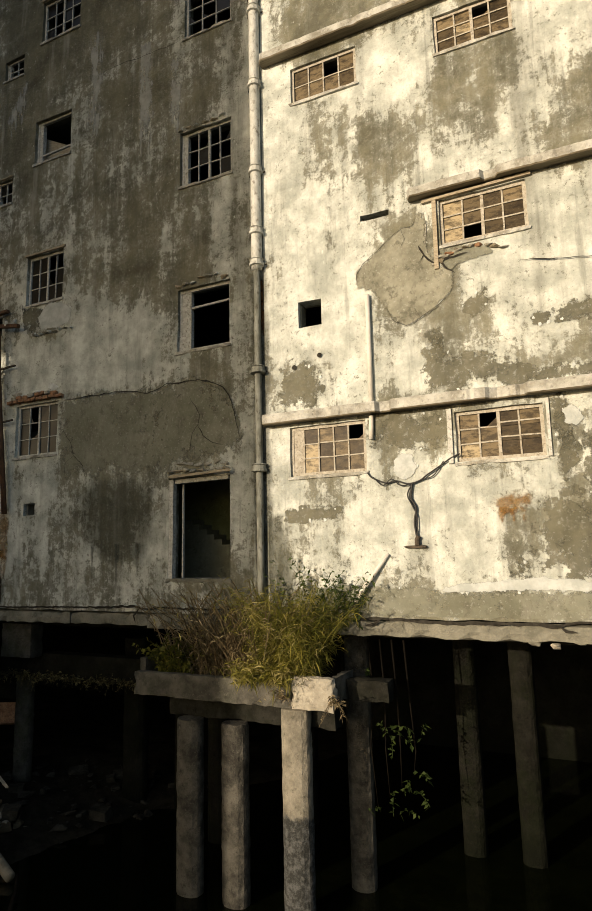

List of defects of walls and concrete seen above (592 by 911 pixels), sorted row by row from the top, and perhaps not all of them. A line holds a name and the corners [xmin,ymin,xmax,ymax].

water stain [86,32,103,136]
water stain [139,42,153,156]
peeling [530,298,592,326]
crack [62,379,242,450]
peeling [276,358,325,412]
peeling [420,327,592,391]
peeling [273,392,592,621]
rust [497,494,530,522]
rust [0,510,8,576]